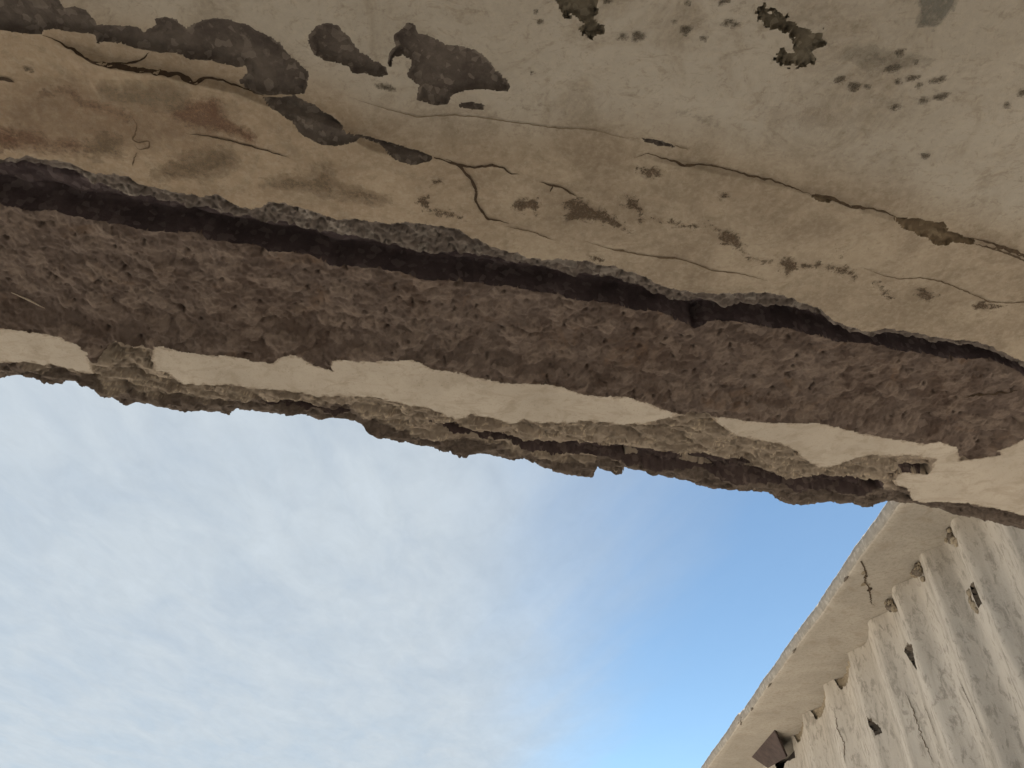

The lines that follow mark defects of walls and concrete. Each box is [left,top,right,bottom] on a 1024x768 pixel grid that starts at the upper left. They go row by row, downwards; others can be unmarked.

crack [43,35,261,95]
flaking render [0,0,432,166]
flaking render [308,23,510,110]
flaking render [557,0,611,40]
flaking render [755,2,826,69]
crack [187,133,286,157]
crack [361,101,898,219]
crack [429,155,556,241]
crack [968,237,1024,261]
spalling [0,155,1024,529]
crack [860,561,875,606]
spalling [966,582,982,614]